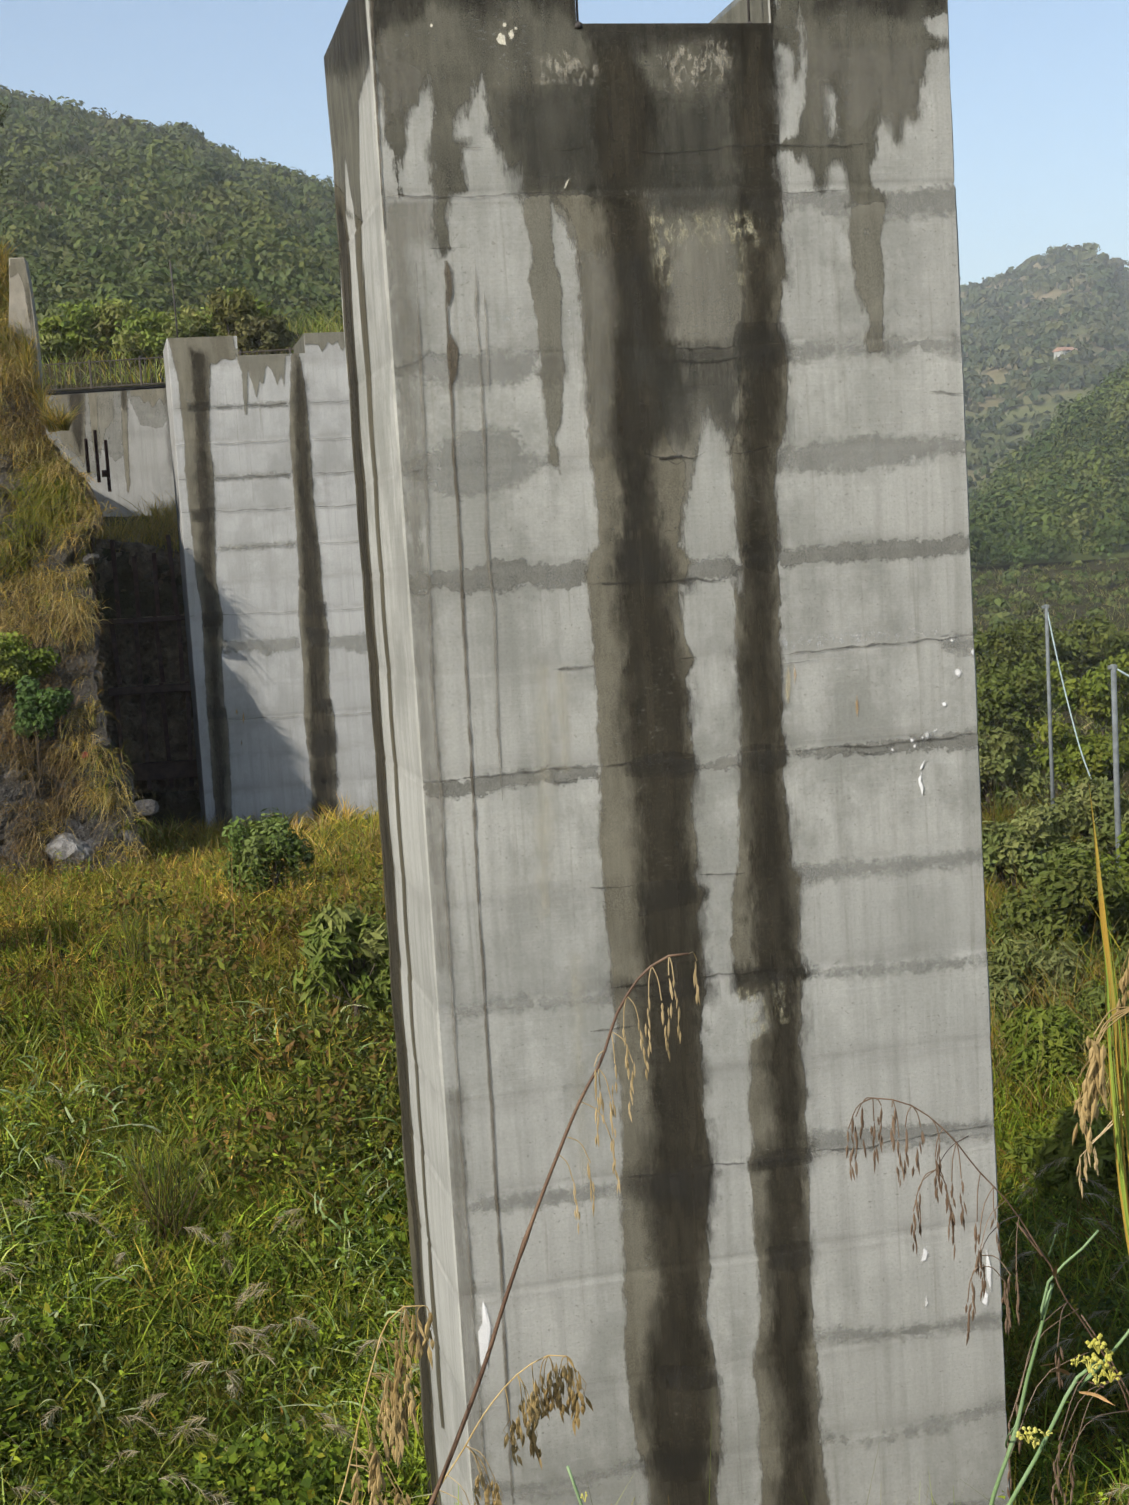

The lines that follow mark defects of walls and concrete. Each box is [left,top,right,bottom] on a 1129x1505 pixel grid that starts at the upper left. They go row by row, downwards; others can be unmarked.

water stain [45,388,170,492]
water stain [168,0,1005,1505]